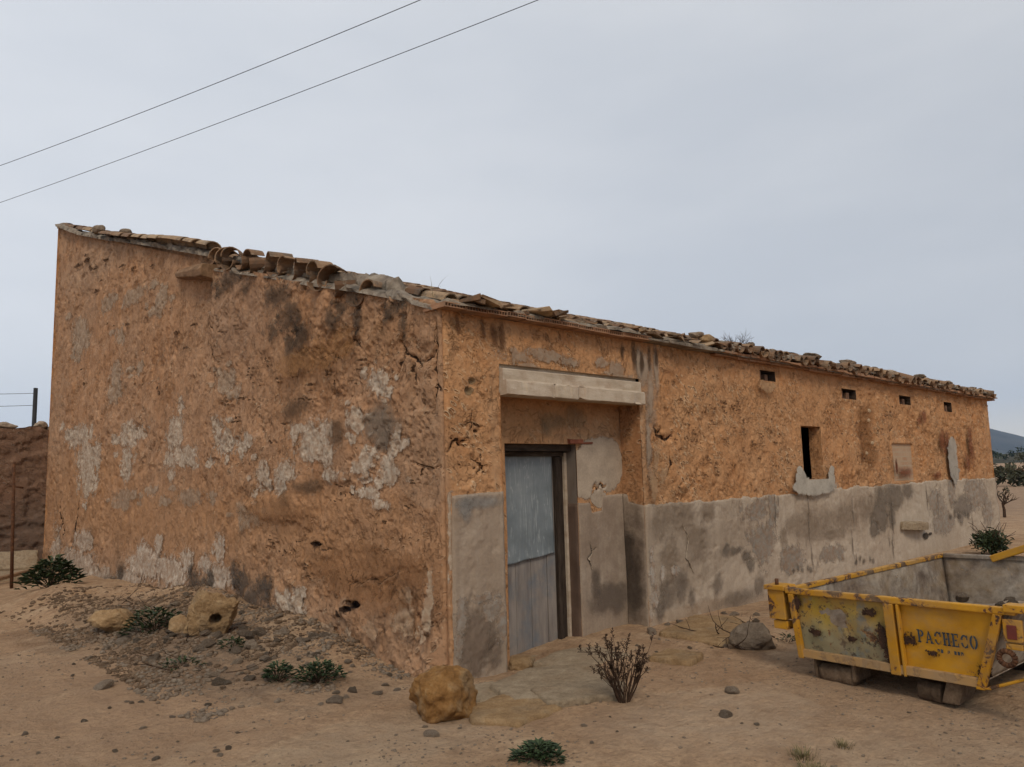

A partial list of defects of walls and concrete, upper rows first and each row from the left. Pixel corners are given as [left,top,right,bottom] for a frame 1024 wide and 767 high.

peeling [59,419,148,510]
peeling [163,393,416,531]
crack [399,320,442,410]
crack [411,413,487,476]
damp [621,345,659,465]